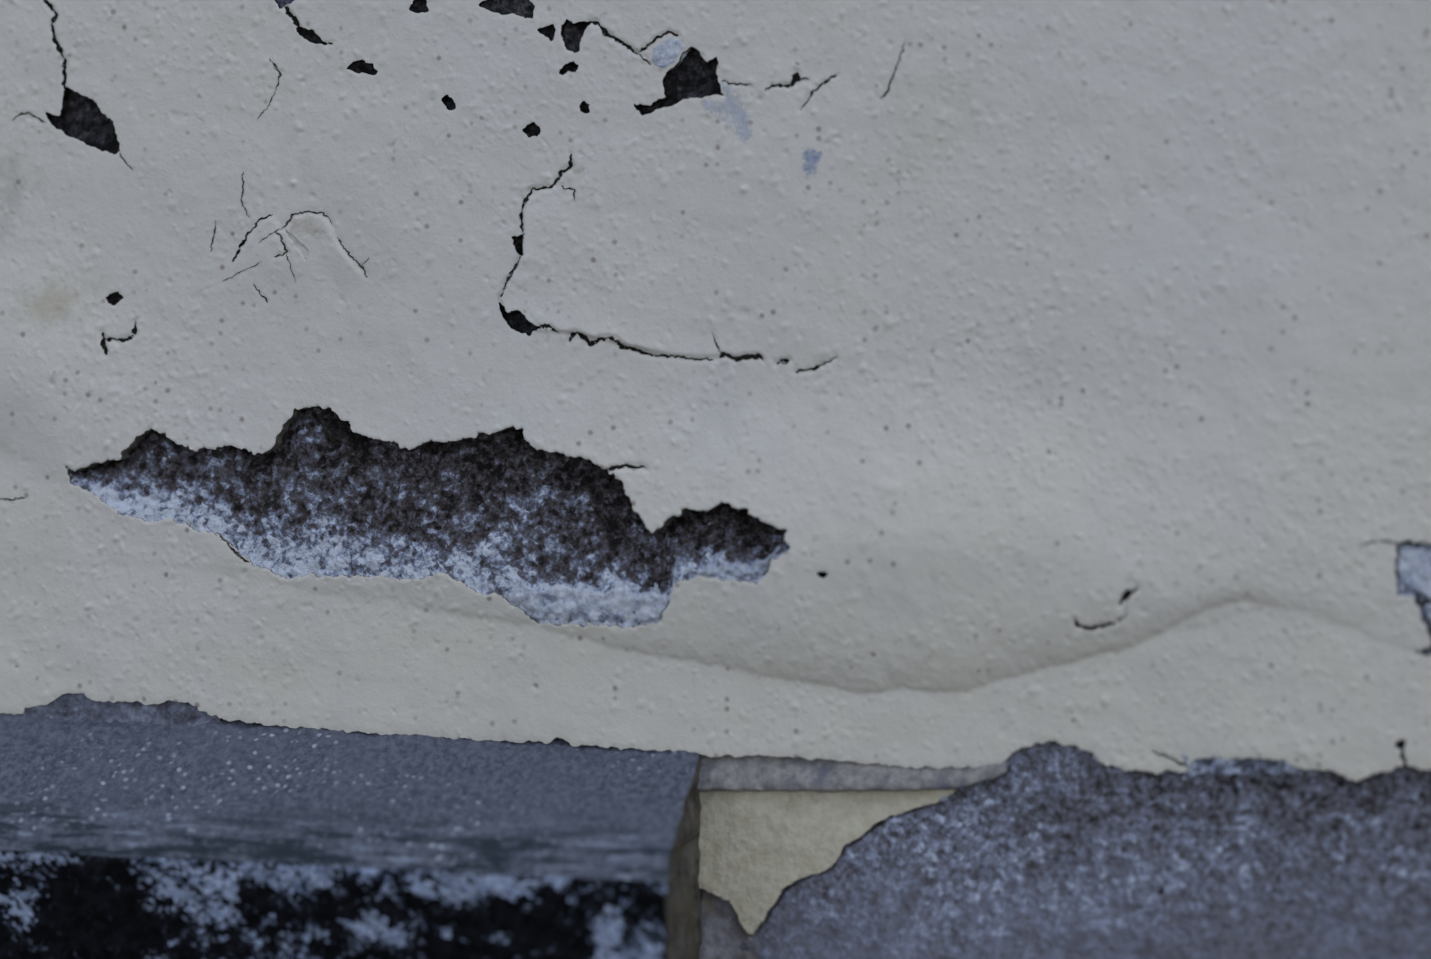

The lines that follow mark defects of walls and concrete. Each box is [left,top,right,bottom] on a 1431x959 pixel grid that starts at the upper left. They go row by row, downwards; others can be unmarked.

crack [44,0,67,89]
peeling [296,27,328,45]
peeling [346,60,378,75]
peeling [479,0,592,75]
peeling [634,37,724,115]
crack [13,112,45,123]
crack [500,154,576,297]
crack [100,321,137,355]
crack [540,323,837,373]
spalling [65,406,790,628]
crack [1074,587,1138,631]
spalling [698,740,1431,959]